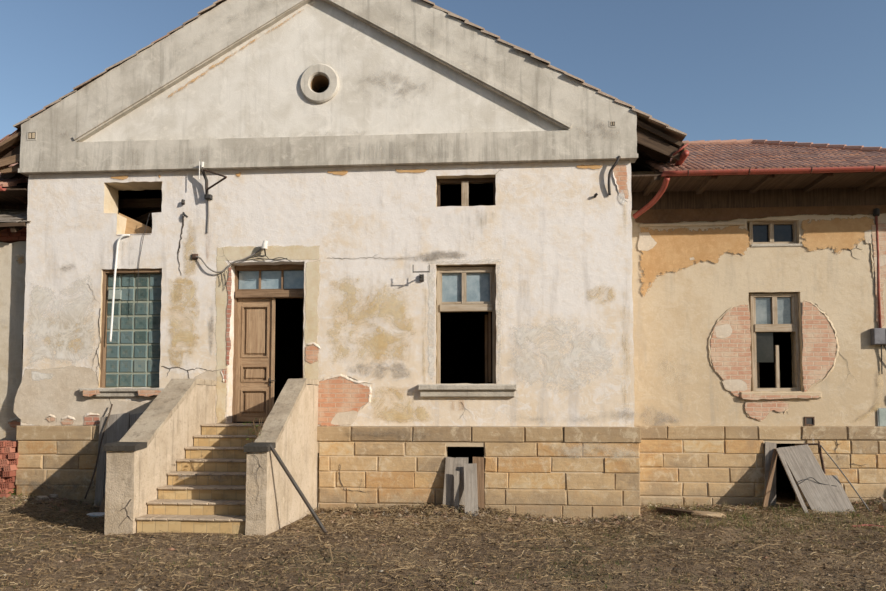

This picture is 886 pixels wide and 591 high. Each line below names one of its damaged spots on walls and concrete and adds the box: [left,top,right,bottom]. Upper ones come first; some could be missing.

spalling [577,165,628,204]
peeling [635,205,886,326]
peeling [7,366,161,427]
crack [161,366,222,378]
spalling [305,342,321,363]
spalling [318,374,374,426]
peeling [383,388,429,422]
spalling [708,300,839,421]